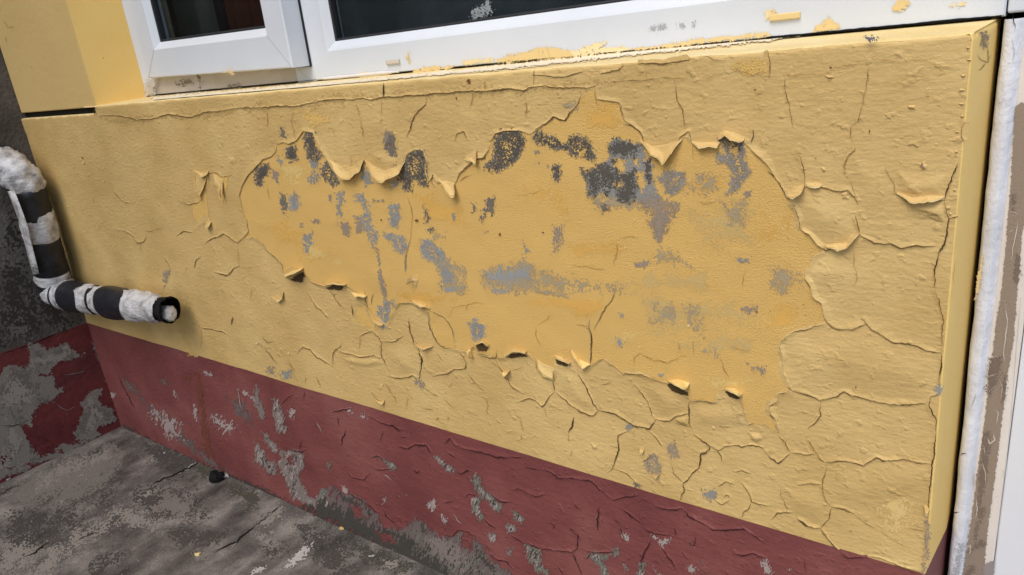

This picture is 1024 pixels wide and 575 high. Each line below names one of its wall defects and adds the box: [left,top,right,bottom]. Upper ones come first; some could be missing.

peeling [0,48,37,167]
peeling [0,186,118,480]
peeling [192,89,860,433]
crack [93,50,964,575]
peeling [896,192,944,204]
flaking render [224,384,550,575]
flaking render [585,547,647,575]
peeling [639,439,681,478]